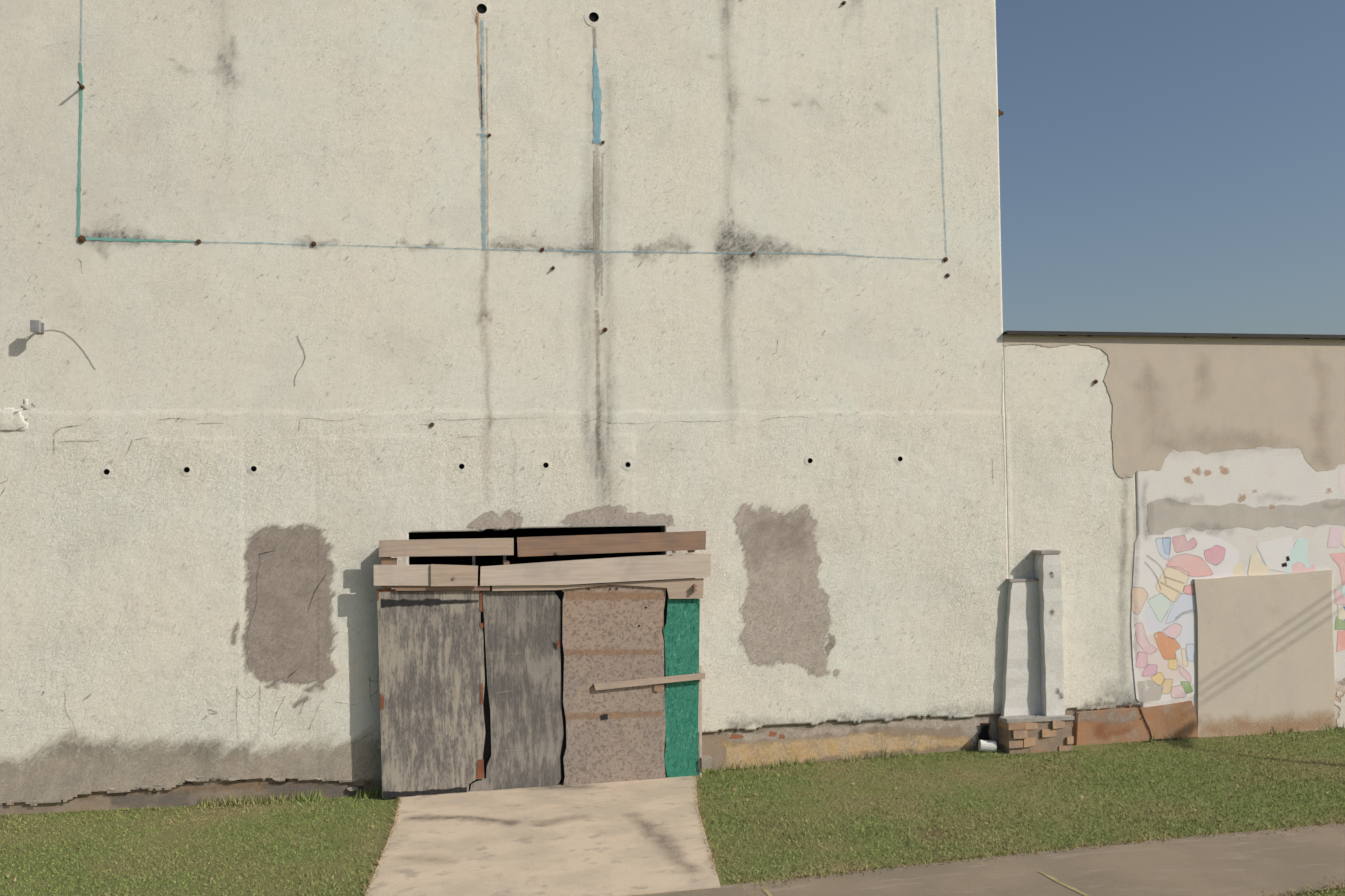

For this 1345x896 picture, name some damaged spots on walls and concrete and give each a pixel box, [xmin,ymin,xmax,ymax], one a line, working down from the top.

spalling [1334,679,1345,729]